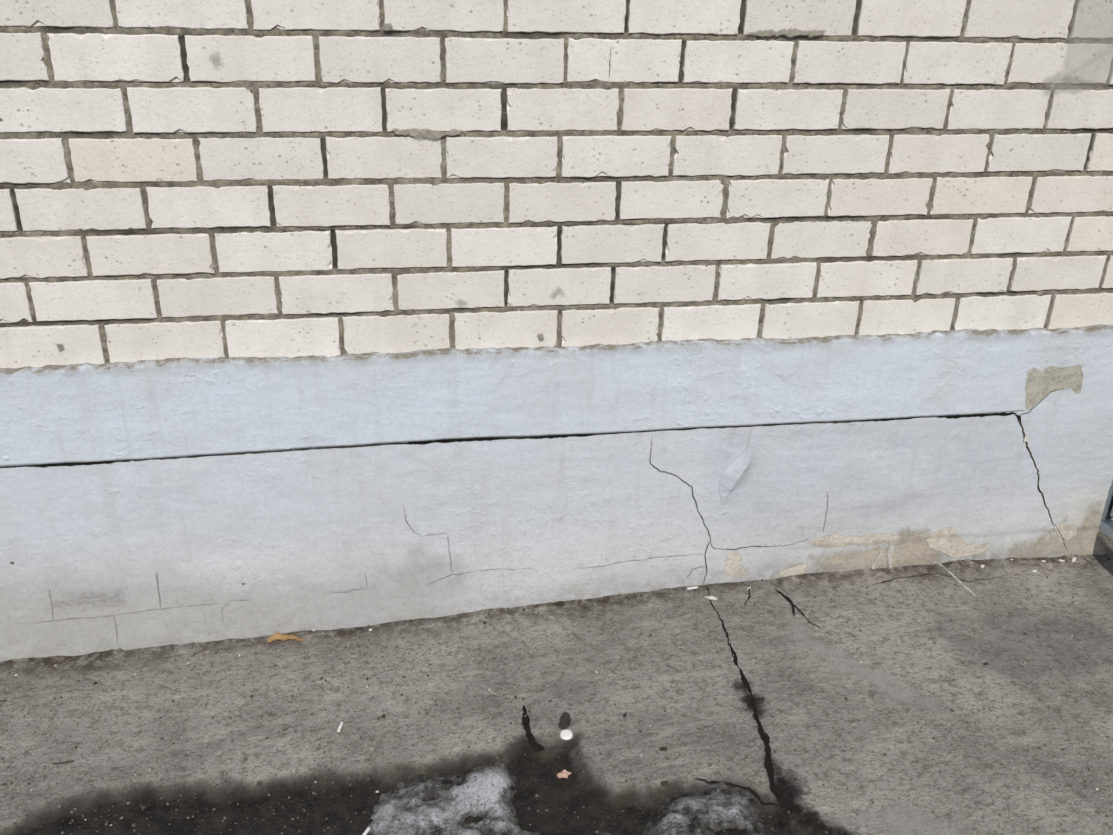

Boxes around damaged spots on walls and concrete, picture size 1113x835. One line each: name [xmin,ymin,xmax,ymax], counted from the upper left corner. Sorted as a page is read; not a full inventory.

peeling [1024,363,1085,413]
spalling [778,526,991,577]
crack [0,389,1069,808]